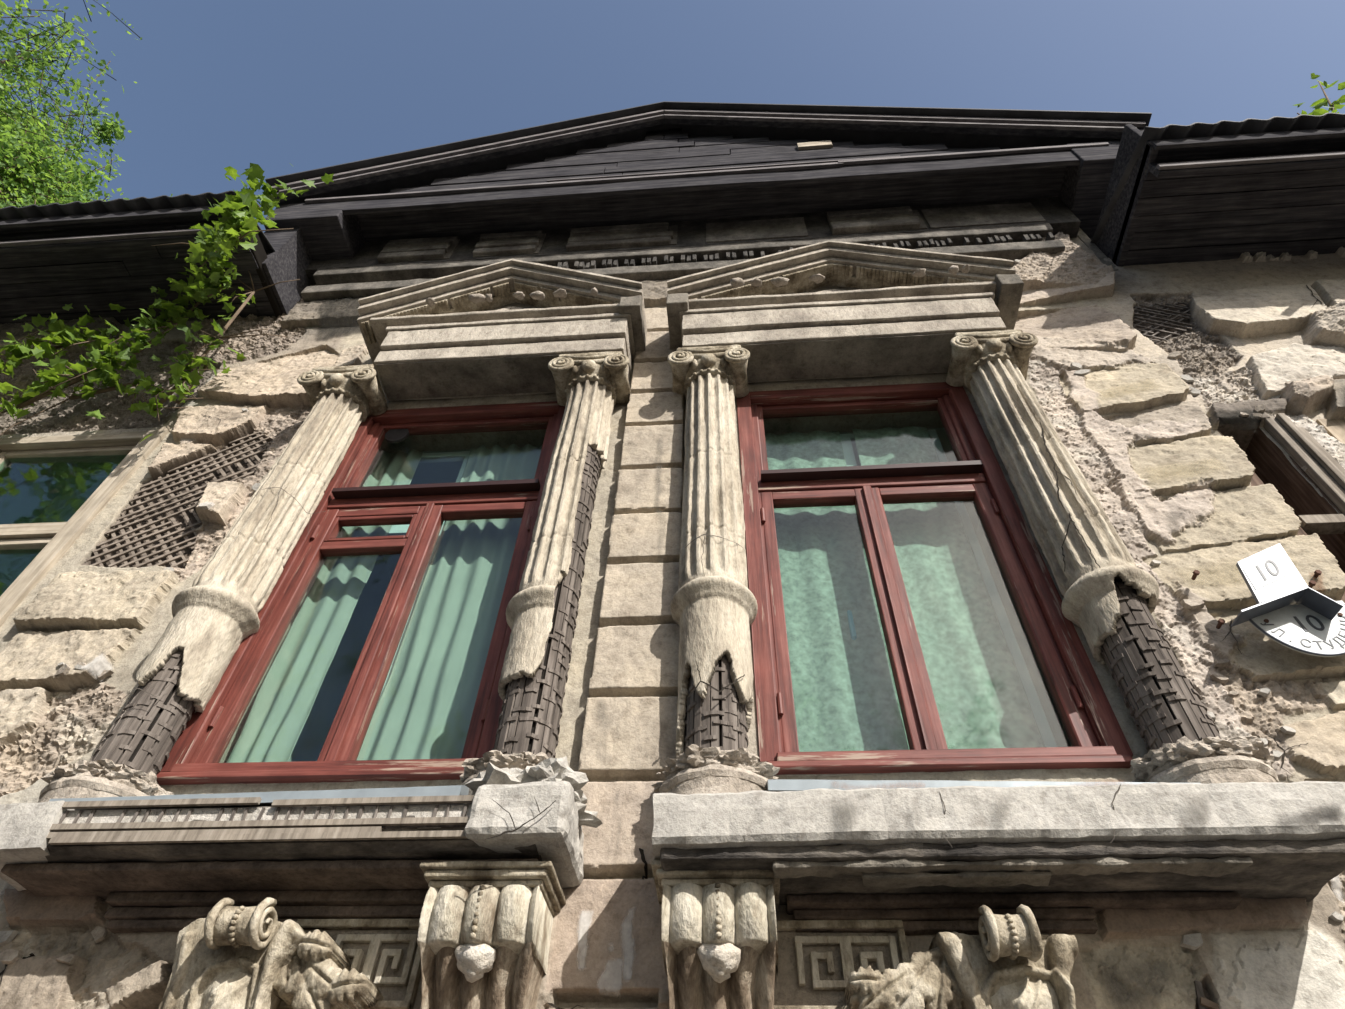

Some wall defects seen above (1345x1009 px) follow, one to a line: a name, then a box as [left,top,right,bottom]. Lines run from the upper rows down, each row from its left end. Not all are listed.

spalling [1130,290,1345,469]
spalling [164,394,312,583]
crack [1039,420,1100,572]
spalling [1027,346,1335,781]
spalling [0,889,174,1009]